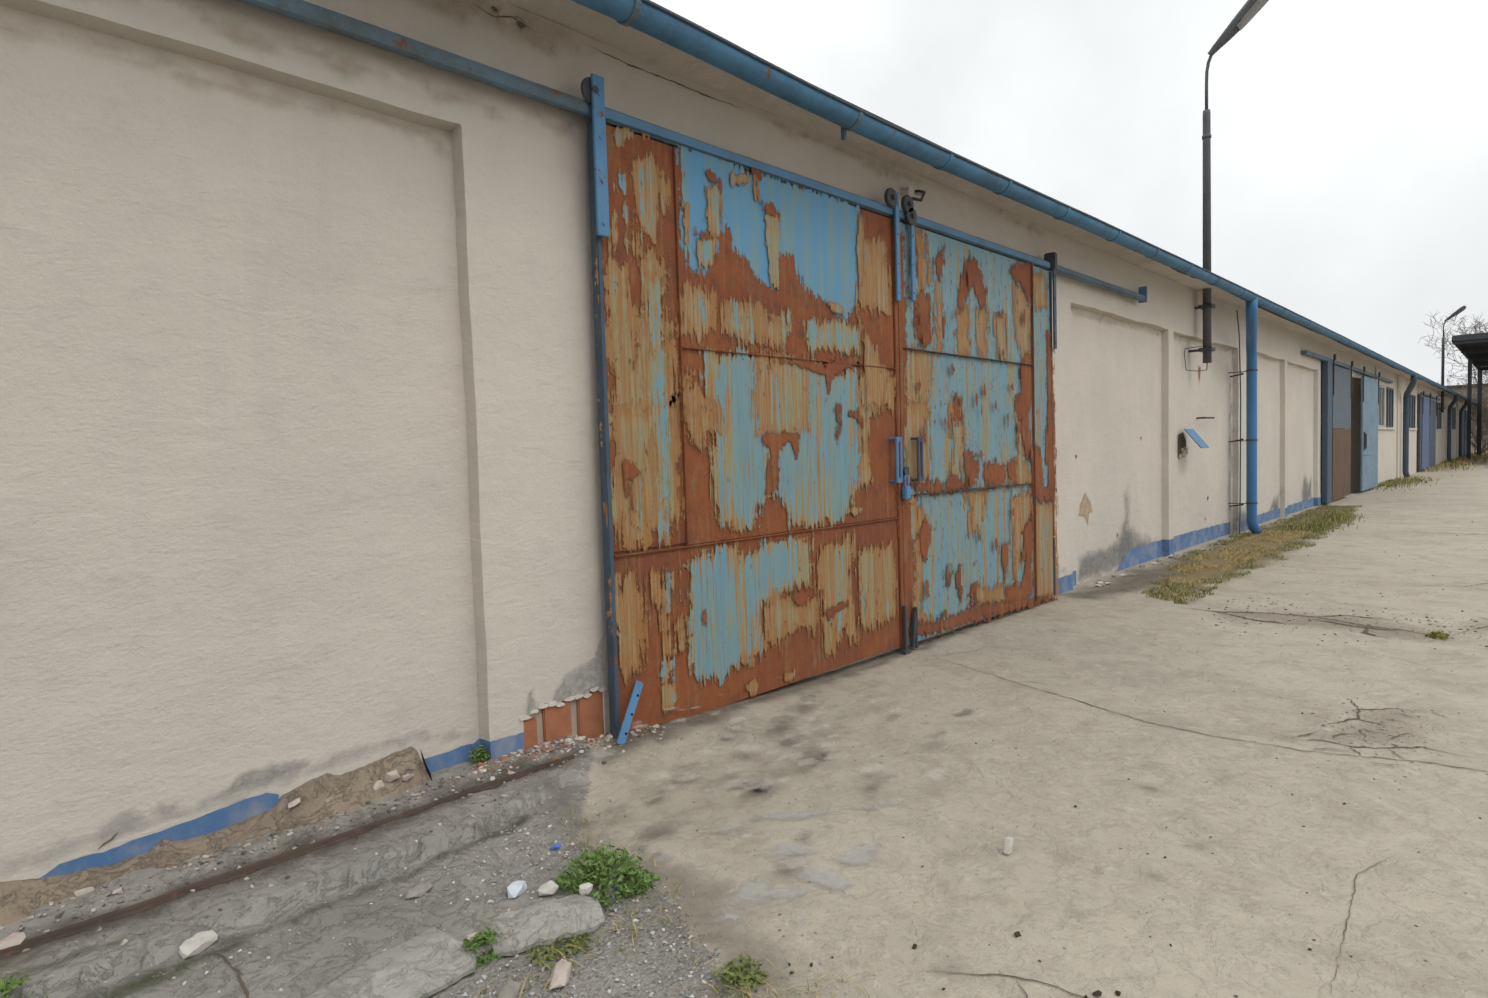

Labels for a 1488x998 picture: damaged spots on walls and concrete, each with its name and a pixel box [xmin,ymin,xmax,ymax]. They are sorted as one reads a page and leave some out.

corrosion [705,168,723,195]
corrosion [761,200,781,222]
peeling [519,126,899,758]
corrosion [762,430,800,497]
corrosion [774,355,864,445]
corrosion [891,229,1033,444]
corrosion [896,329,1057,640]
peeling [1079,493,1092,524]
damp [1081,530,1145,577]
spalling [649,667,844,800]
crack [934,645,1488,772]
crack [1318,851,1401,997]